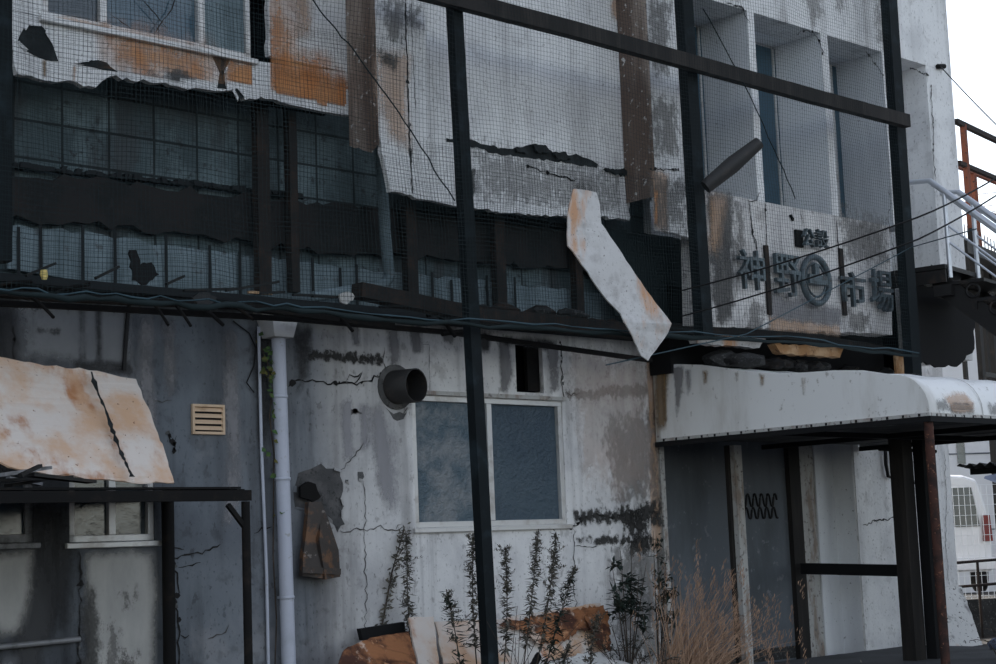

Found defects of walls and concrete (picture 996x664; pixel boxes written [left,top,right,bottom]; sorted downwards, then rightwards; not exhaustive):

rust [117,39,204,81]
spalling [213,57,244,101]
rust [227,61,252,84]
rust [271,0,348,106]
peeling [514,144,571,161]
rust [947,394,973,412]
spalling [293,464,364,532]
crack [287,350,402,627]
leakage [573,498,664,556]
leakage [0,507,73,664]
crack [76,552,84,664]
leakage [81,550,157,664]